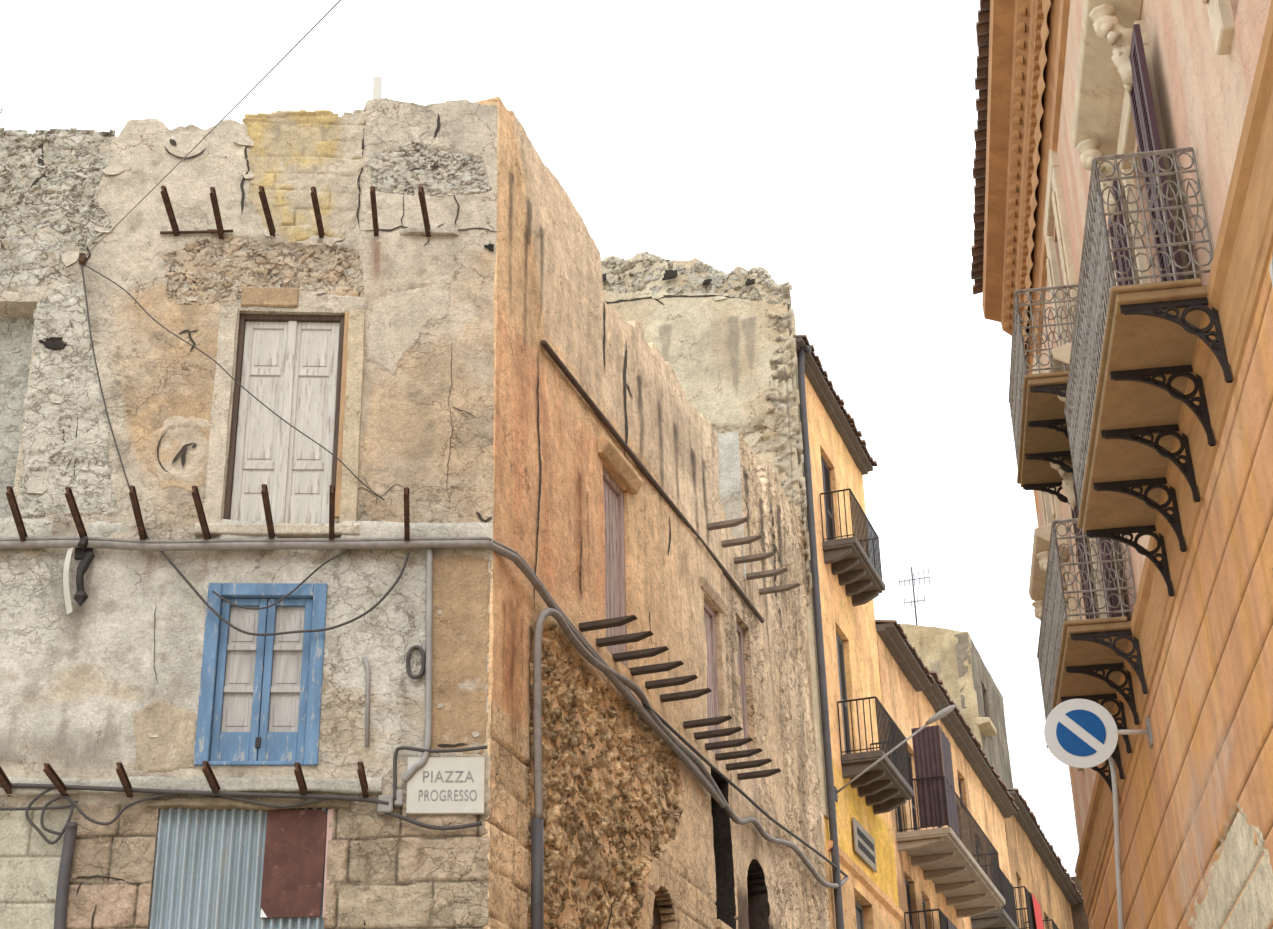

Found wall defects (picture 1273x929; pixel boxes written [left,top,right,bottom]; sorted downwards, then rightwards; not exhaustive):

spalling [0,128,125,267]
spalling [163,109,492,375]
peeling [17,276,119,519]
spalling [526,621,683,929]
spalling [1188,803,1273,929]